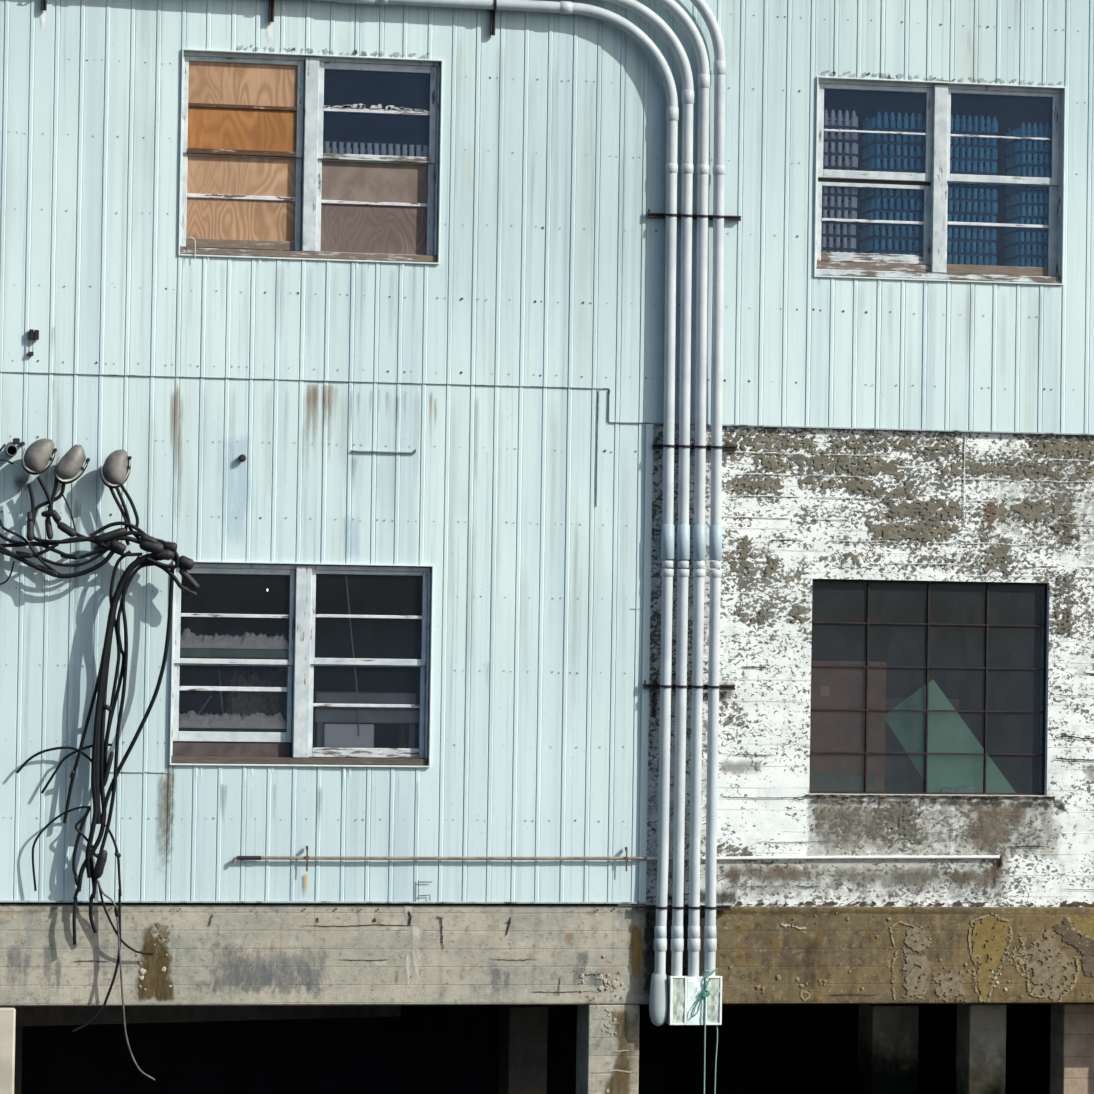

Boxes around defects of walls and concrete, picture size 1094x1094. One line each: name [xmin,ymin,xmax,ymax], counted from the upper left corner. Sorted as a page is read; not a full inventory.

peeling [722,428,1094,579]
peeling [735,605,772,625]
peeling [787,598,811,624]
peeling [1050,568,1094,638]
peeling [719,706,750,728]
water stain [158,767,174,853]
peeling [809,799,924,844]
water stain [811,798,1065,848]
peeling [717,843,753,861]
water stain [888,916,935,1001]
water stain [968,910,1094,1002]